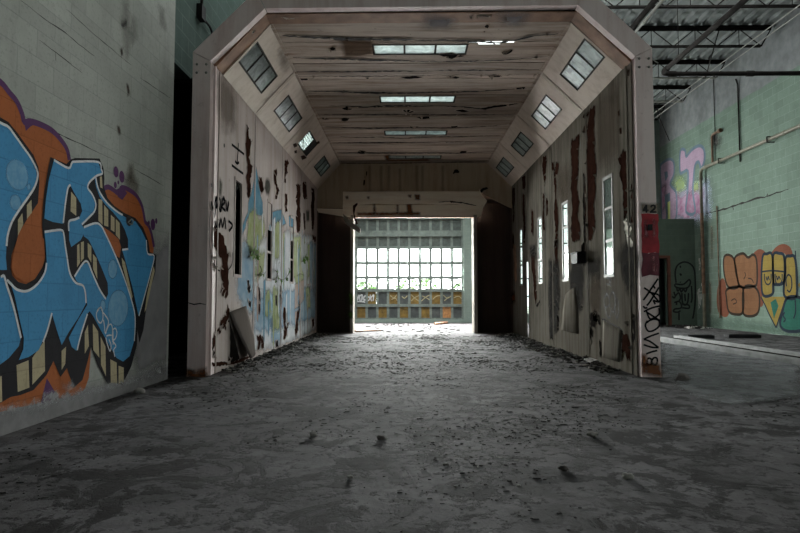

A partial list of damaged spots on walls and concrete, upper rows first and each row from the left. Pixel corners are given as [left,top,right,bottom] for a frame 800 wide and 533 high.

peeling [245,124,264,199]
crack [282,32,562,164]
peeling [570,105,597,251]
peeling [617,148,634,248]
crack [706,189,789,214]
peeling [211,225,231,359]